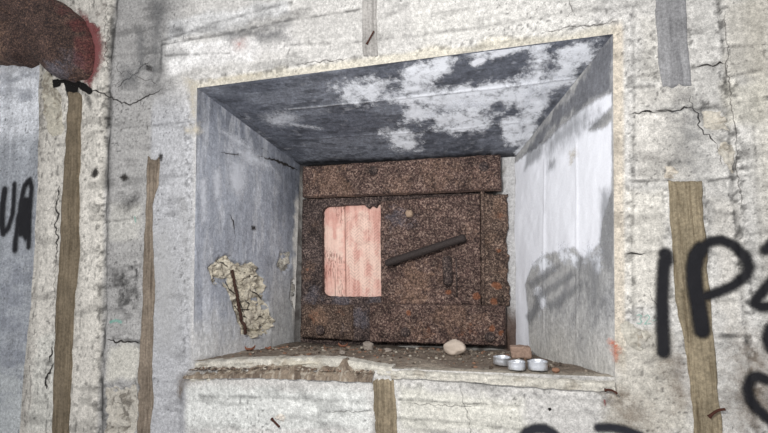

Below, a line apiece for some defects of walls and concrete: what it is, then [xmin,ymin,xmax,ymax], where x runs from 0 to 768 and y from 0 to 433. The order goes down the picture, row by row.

crack [92,5,181,105]
crack [632,11,742,213]
crack [45,186,60,297]
spalling [208,255,275,339]
crack [44,342,54,389]